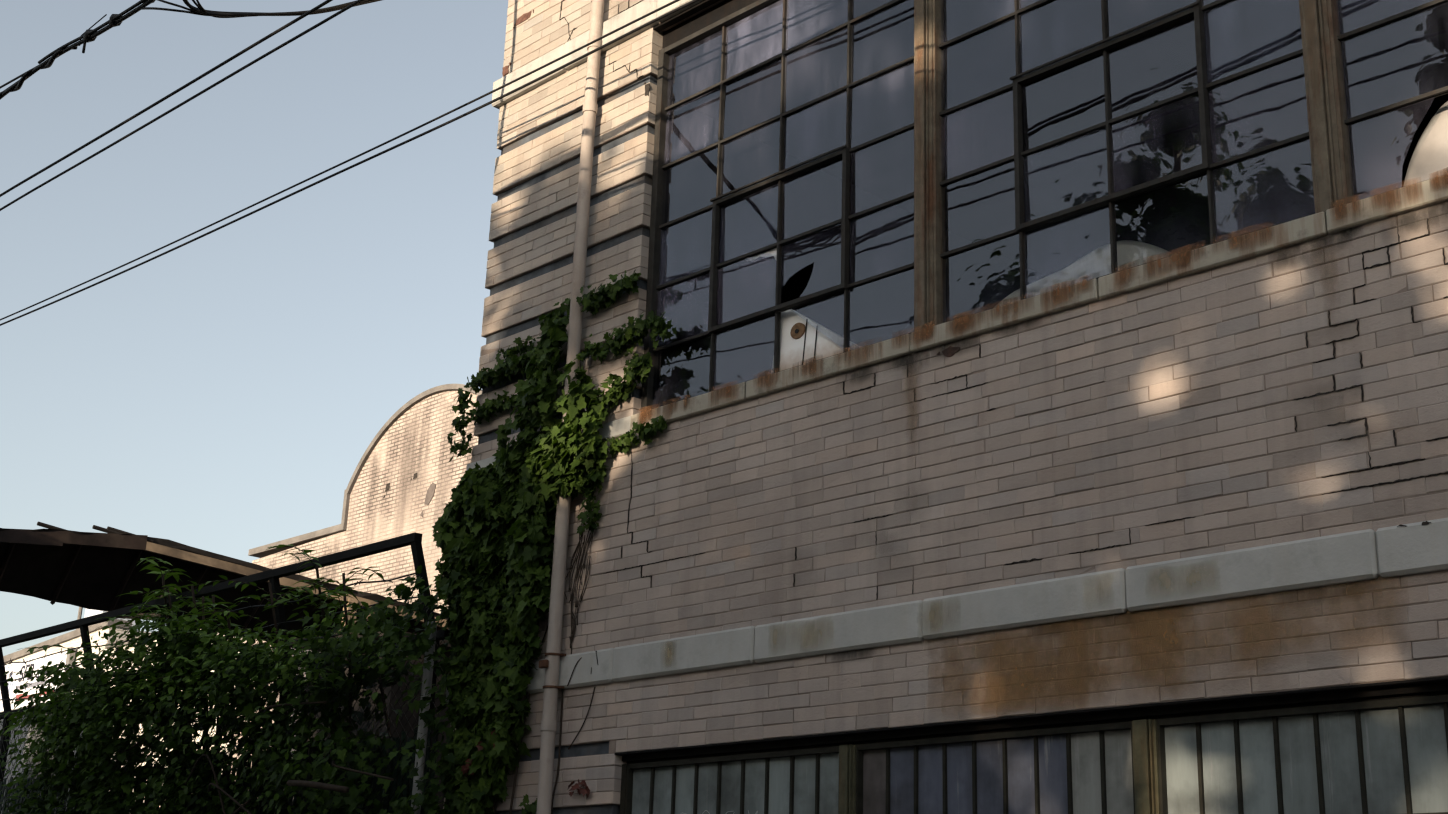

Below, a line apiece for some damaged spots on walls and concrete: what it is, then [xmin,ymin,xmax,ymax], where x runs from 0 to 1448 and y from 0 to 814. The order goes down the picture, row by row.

crack [1294,218,1448,495]
crack [606,442,705,588]